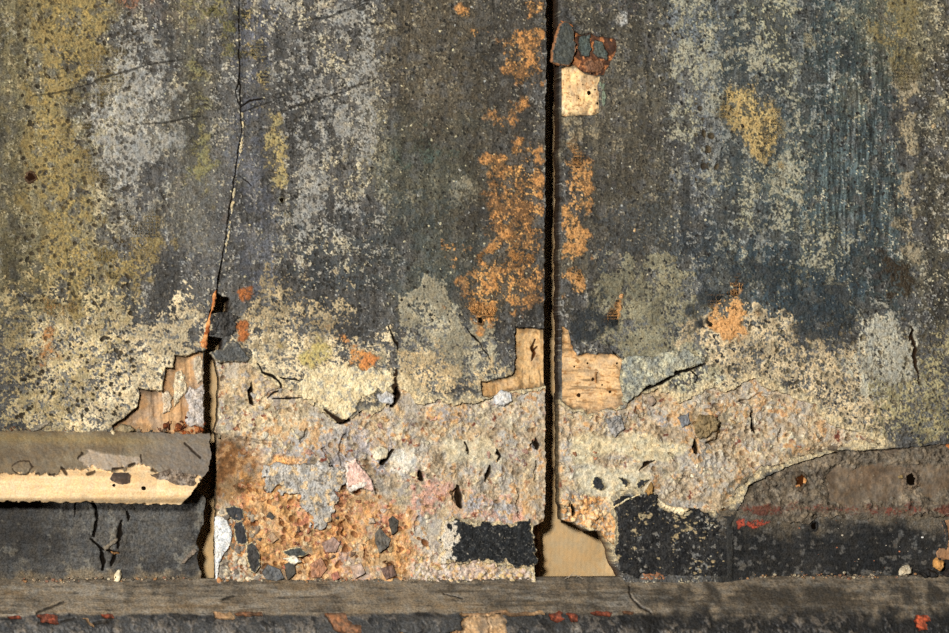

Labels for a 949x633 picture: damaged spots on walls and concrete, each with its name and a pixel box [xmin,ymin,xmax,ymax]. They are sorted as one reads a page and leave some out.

rust [501,28,545,85]
peeling [550,21,617,116]
crack [218,0,265,279]
rust [455,137,545,336]
rust [561,139,594,293]
rust [707,283,747,341]
crack [632,364,703,399]
spalling [113,312,875,584]
crack [74,502,130,571]